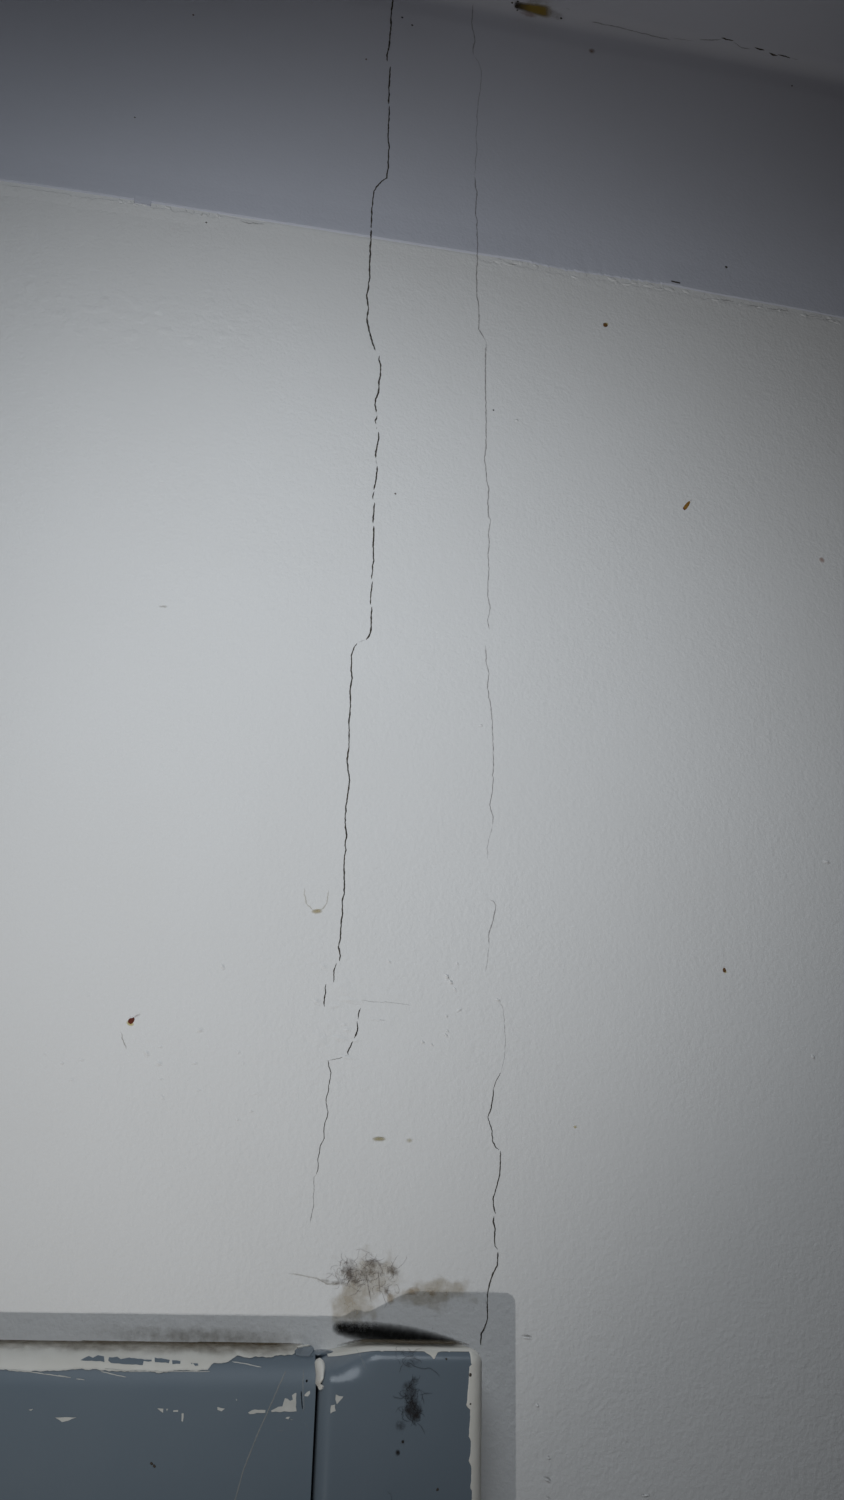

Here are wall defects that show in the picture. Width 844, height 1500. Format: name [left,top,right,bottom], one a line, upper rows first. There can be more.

crack [313,0,394,1207]
crack [480,1075,501,1345]
peeling [82,1355,198,1366]
peeling [217,1391,310,1420]